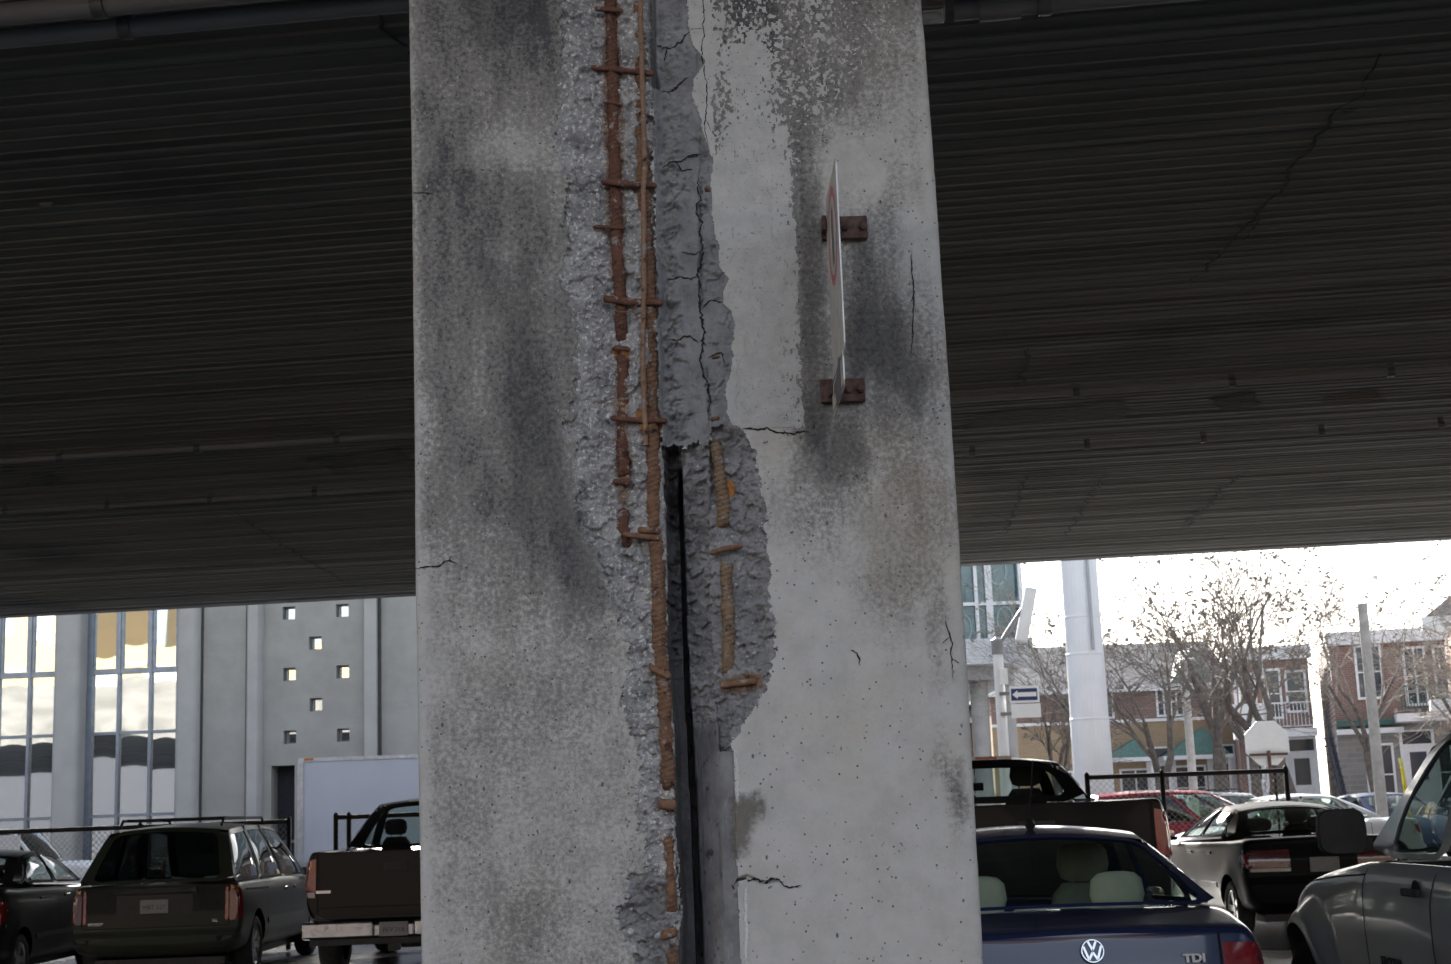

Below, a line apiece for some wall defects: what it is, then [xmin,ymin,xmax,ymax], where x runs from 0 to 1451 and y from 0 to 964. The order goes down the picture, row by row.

spalling [554,0,683,964]
peeling [683,0,916,751]
crack [1189,52,1381,286]
crack [731,877,802,890]